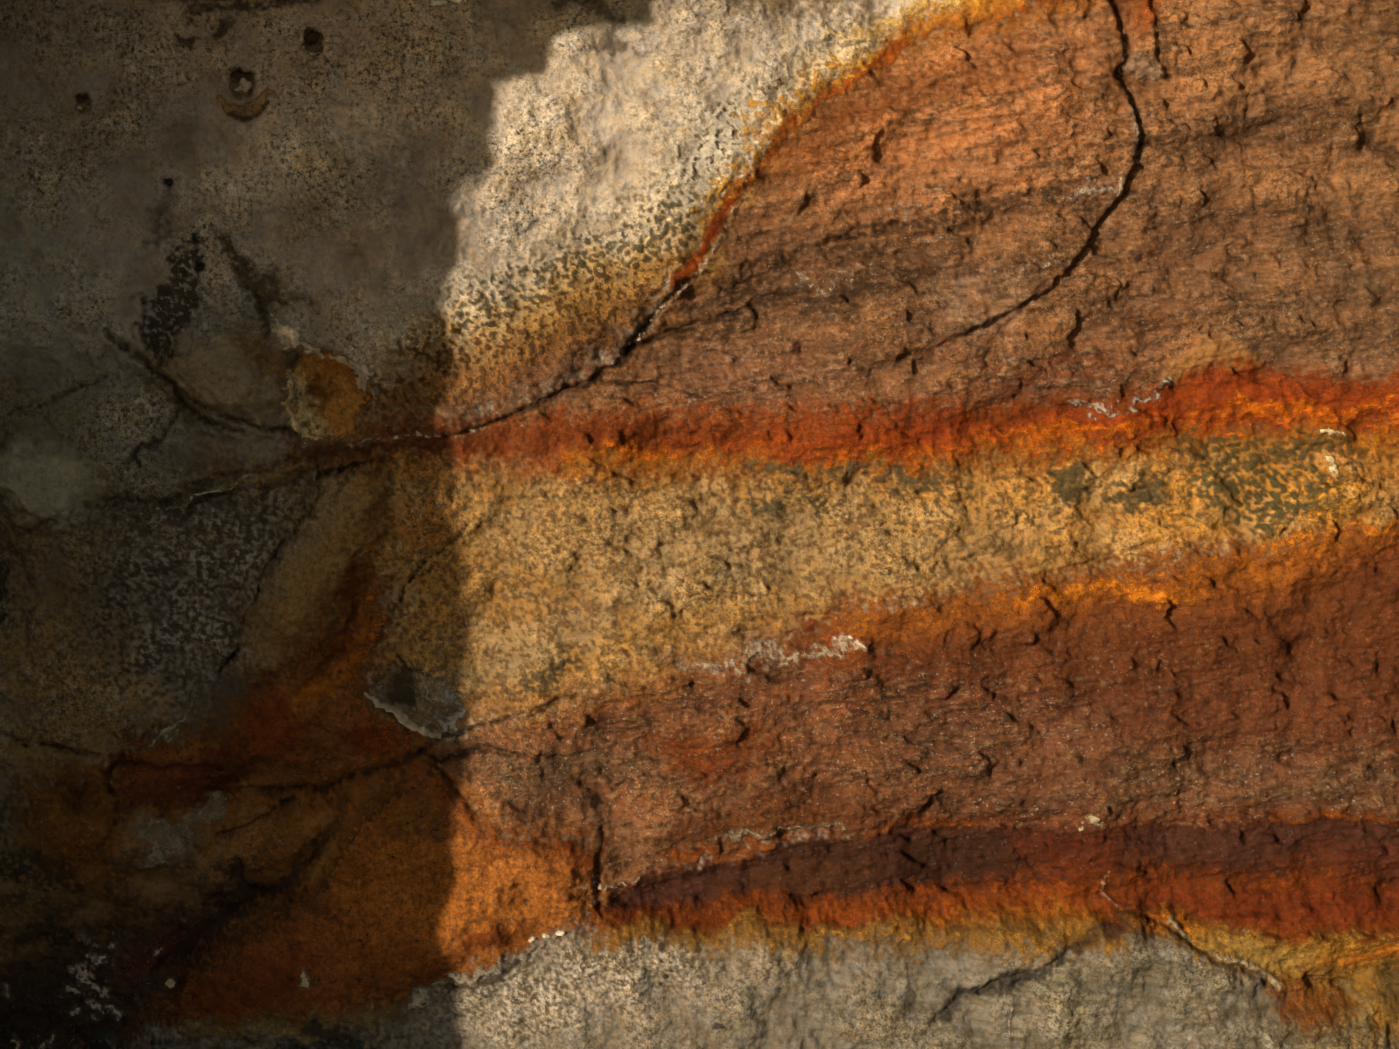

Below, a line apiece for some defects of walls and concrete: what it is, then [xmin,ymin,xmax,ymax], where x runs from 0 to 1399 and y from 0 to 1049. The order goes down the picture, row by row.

corrosion [282,0,1399,479]
corrosion [786,519,1399,696]
crack [222,694,575,833]
spalling [364,654,466,740]
crack [595,832,604,909]
corrosion [0,758,1399,1049]
crack [939,911,1258,1022]